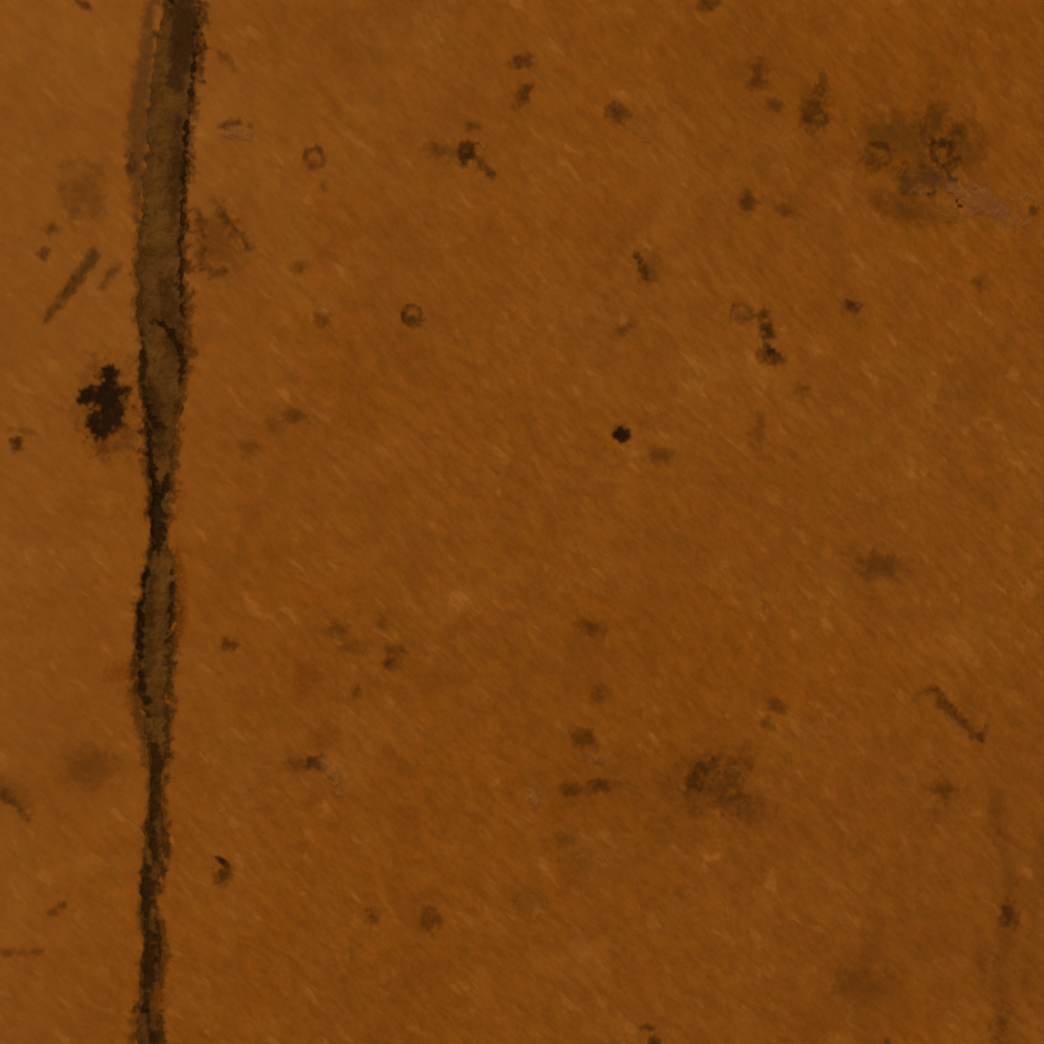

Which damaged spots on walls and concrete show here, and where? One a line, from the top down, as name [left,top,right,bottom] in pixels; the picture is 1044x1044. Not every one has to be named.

damp [77,365,131,439]
crack [133,0,204,1044]